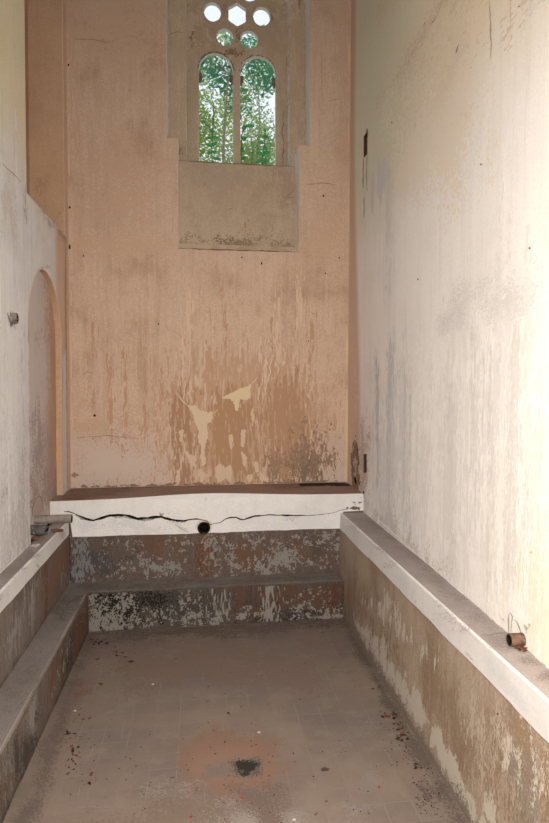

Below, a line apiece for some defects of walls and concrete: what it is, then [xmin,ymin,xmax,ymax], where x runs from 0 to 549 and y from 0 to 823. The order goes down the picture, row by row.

damp [0,0,50,290]
crack [66,326,91,409]
peeling [176,373,217,484]
peeling [215,464,232,482]
peeling [222,377,269,483]
crack [64,500,361,583]
damp [59,529,549,823]
damp [0,708,42,810]